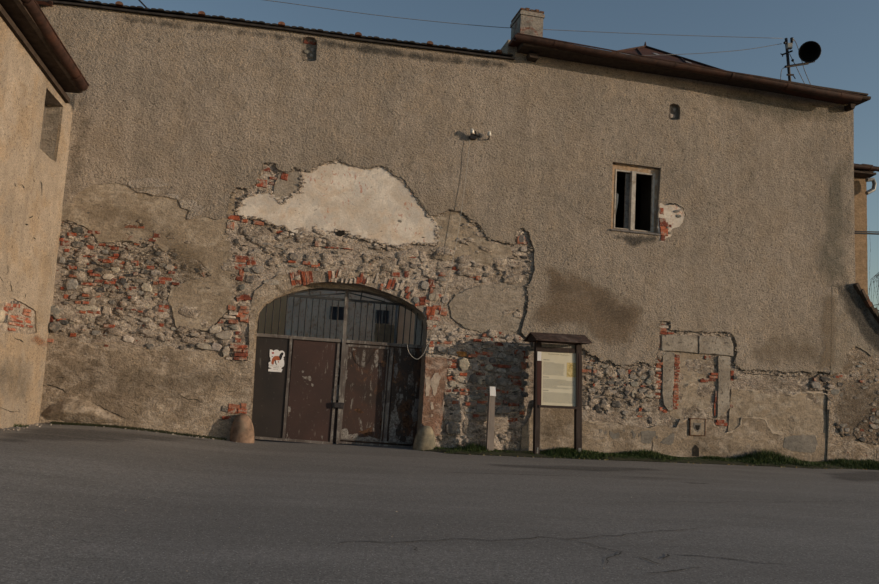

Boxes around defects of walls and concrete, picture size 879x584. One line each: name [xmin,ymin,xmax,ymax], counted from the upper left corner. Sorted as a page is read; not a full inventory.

spalling [658,203,686,242]
spalling [0,299,35,334]
spalling [47,156,571,451]
spalling [582,321,879,461]